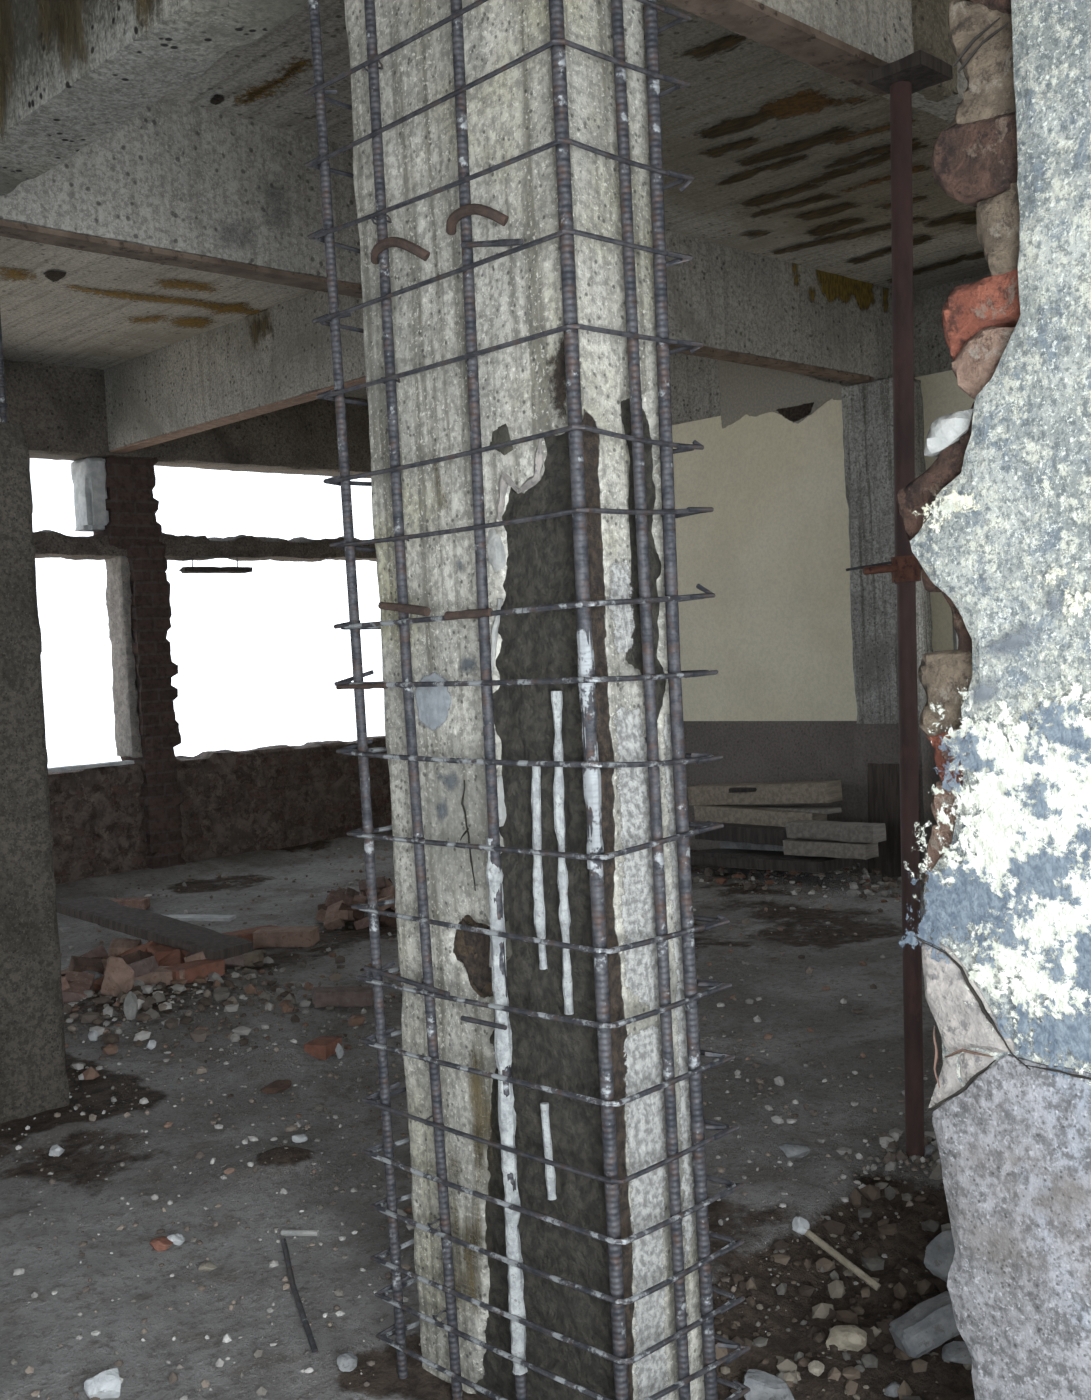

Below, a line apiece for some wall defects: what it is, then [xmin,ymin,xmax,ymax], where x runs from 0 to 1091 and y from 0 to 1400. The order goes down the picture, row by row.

water stain [0,0,159,137]
rust [235,57,325,107]
rust [682,34,747,61]
rust [67,279,264,328]
rust [695,89,892,265]
rust [913,196,977,247]
rust [913,252,985,276]
spalling [896,0,1021,540]
peeling [718,360,843,428]
spalling [620,398,666,720]
spalling [453,338,635,1400]
crack [916,937,1091,1113]